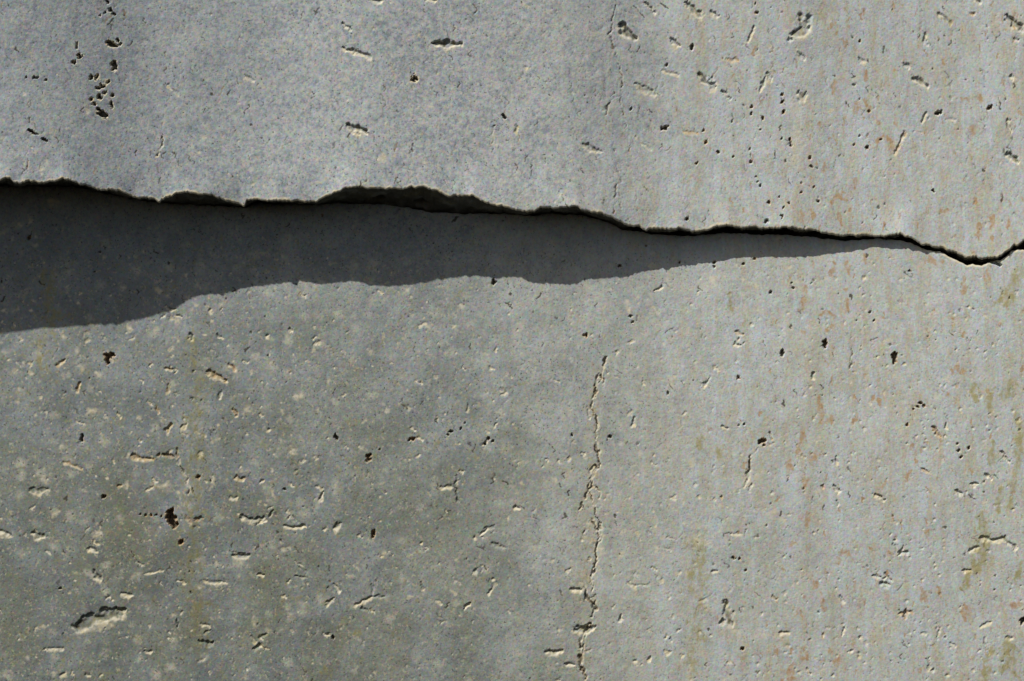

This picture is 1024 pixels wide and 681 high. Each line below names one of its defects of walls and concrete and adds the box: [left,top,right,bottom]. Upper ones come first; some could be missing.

crack [0,0,1024,268]
crack [574,354,609,681]